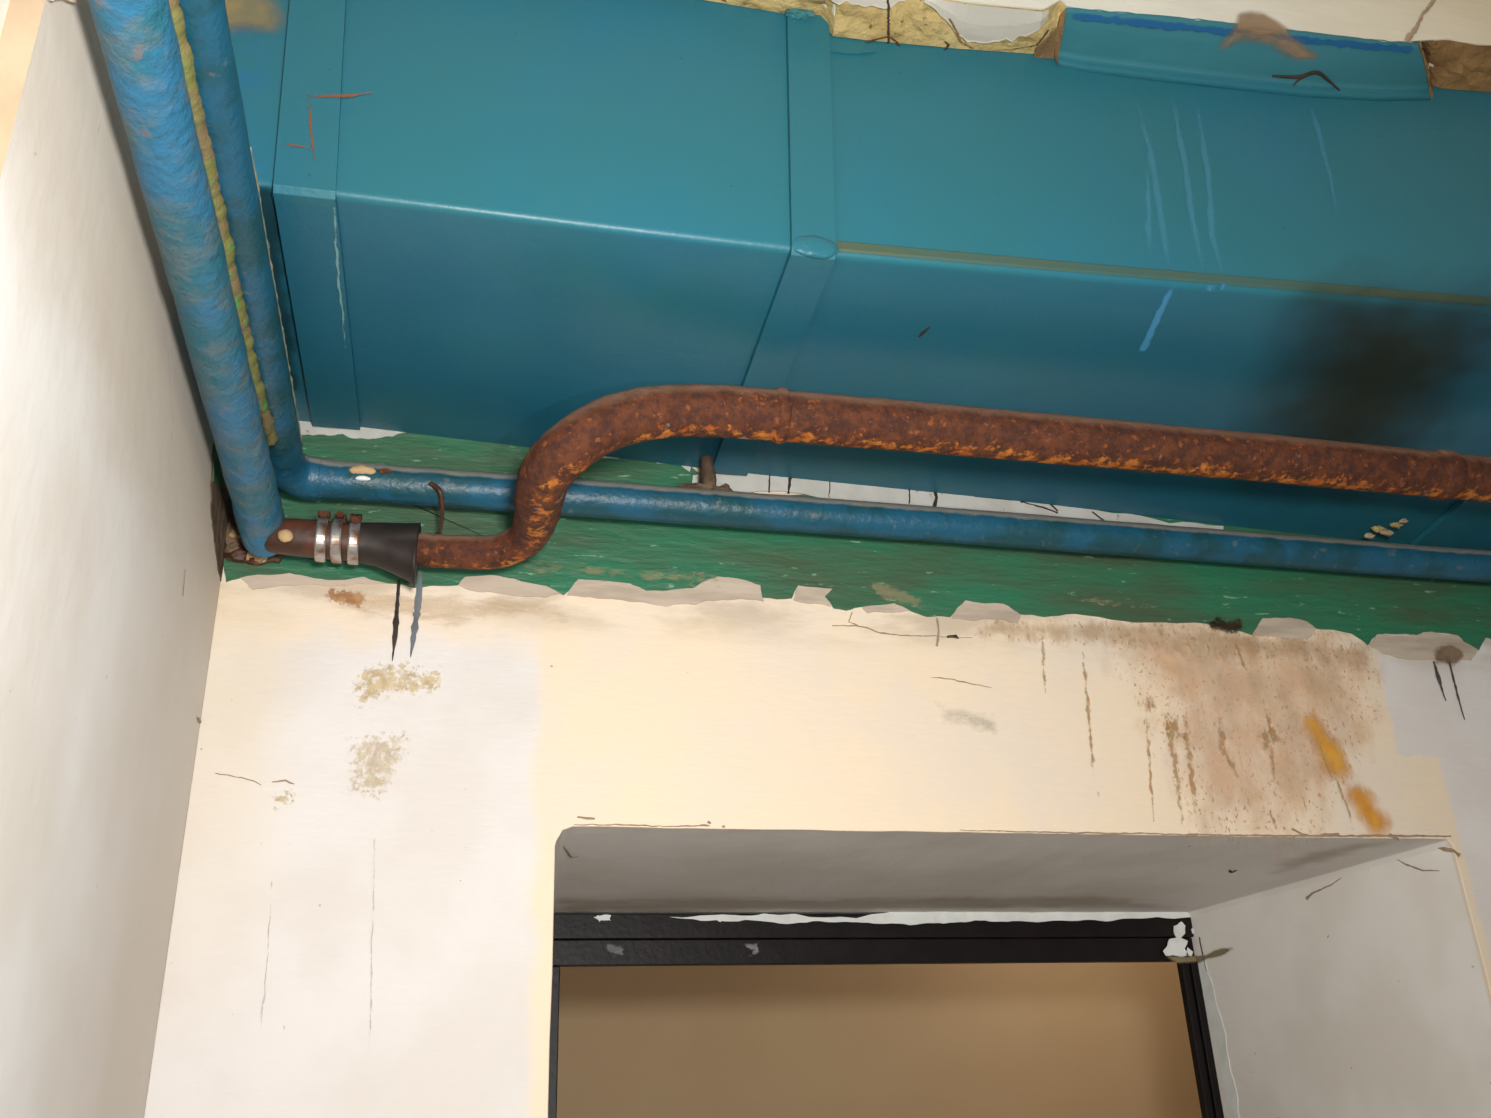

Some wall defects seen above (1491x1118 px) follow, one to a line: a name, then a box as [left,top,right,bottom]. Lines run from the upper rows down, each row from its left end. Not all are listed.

spalling [707,0,1066,59]
spalling [1421,40,1491,92]
peeling [299,421,407,439]
spalling [210,442,386,590]
corrosion [328,588,366,608]
peeling [459,575,764,607]
peeling [952,600,1021,624]
peeling [1369,632,1480,661]
water stain [358,666,436,700]
water stain [1083,654,1095,762]
water stain [1115,617,1373,831]
corrosion [1306,718,1385,831]